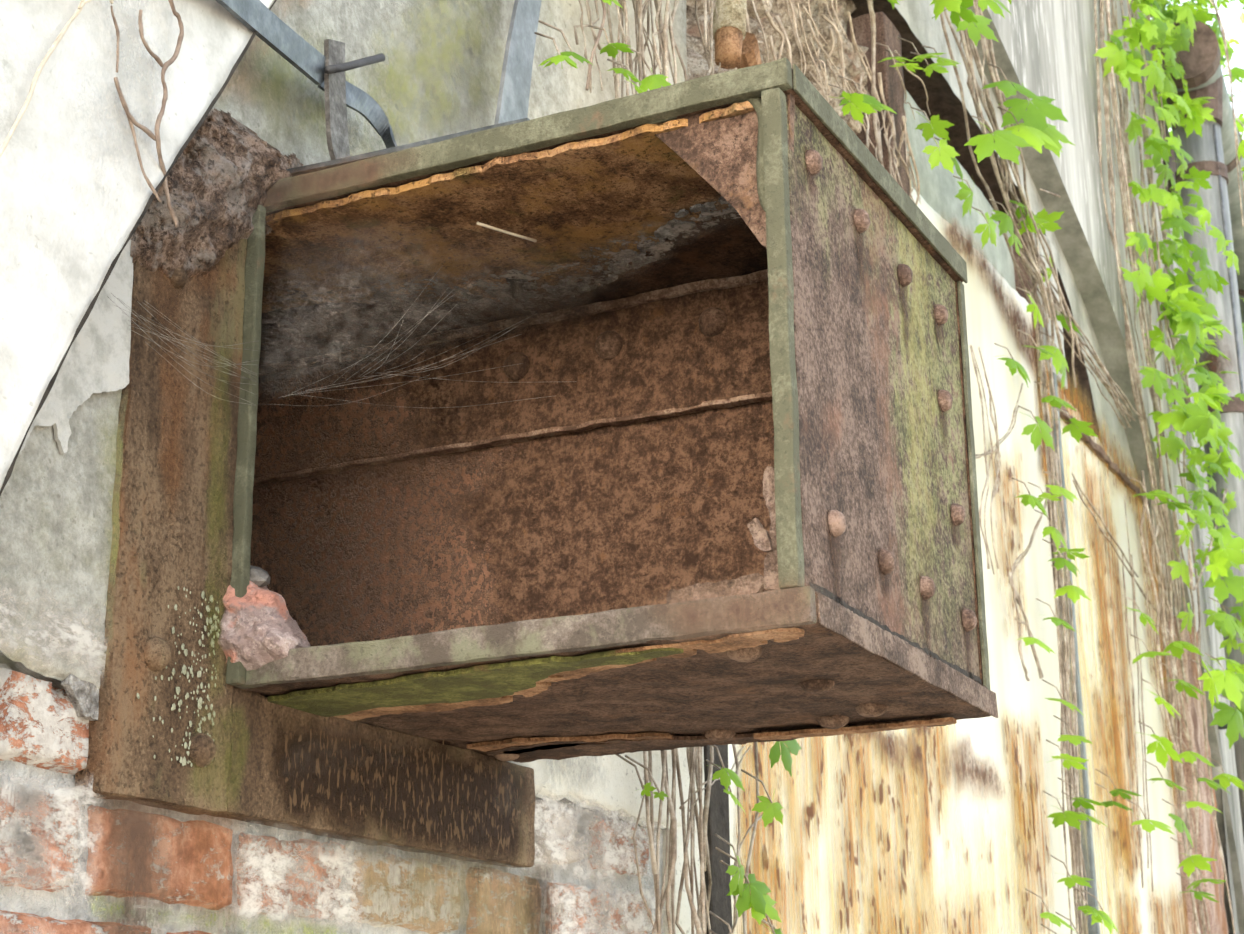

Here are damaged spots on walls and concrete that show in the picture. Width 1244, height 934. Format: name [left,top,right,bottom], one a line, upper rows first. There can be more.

peeling [19,235,133,454]
corrosion [1203,341,1227,388]
spalling [0,604,107,668]
spalling [61,673,99,721]
corrosion [947,221,1189,934]
peeling [0,778,98,890]
leakage [93,798,168,934]
corrosion [276,627,1050,934]